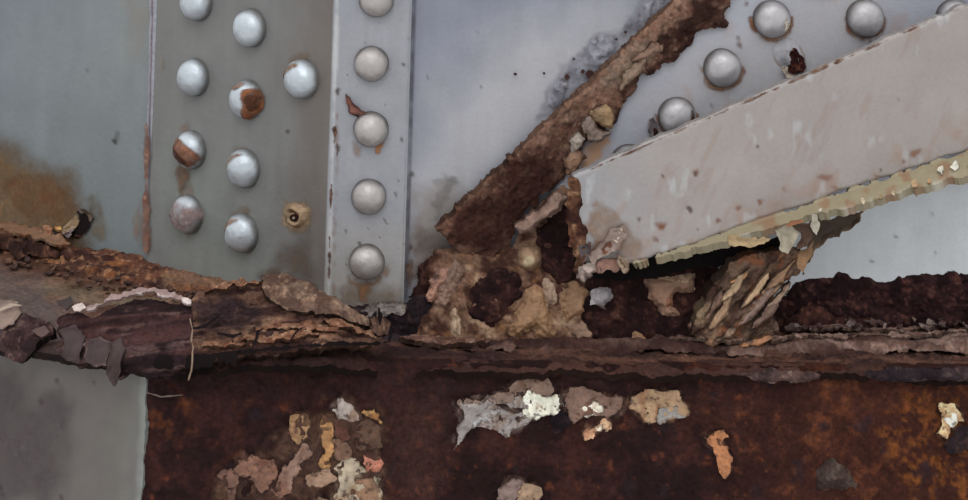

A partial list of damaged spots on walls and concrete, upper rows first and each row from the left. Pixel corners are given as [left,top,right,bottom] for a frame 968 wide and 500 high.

corrosion [749,17,793,42]
corrosion [702,66,745,91]
corrosion [232,83,264,120]
corrosion [345,94,366,117]
peeling [911,160,959,188]
peeling [727,198,865,275]
corrosion [0,124,968,387]
peeling [217,397,384,500]
corrosion [215,393,387,500]
corrosion [548,409,572,434]
peeling [453,378,691,451]
corrosion [942,425,968,454]